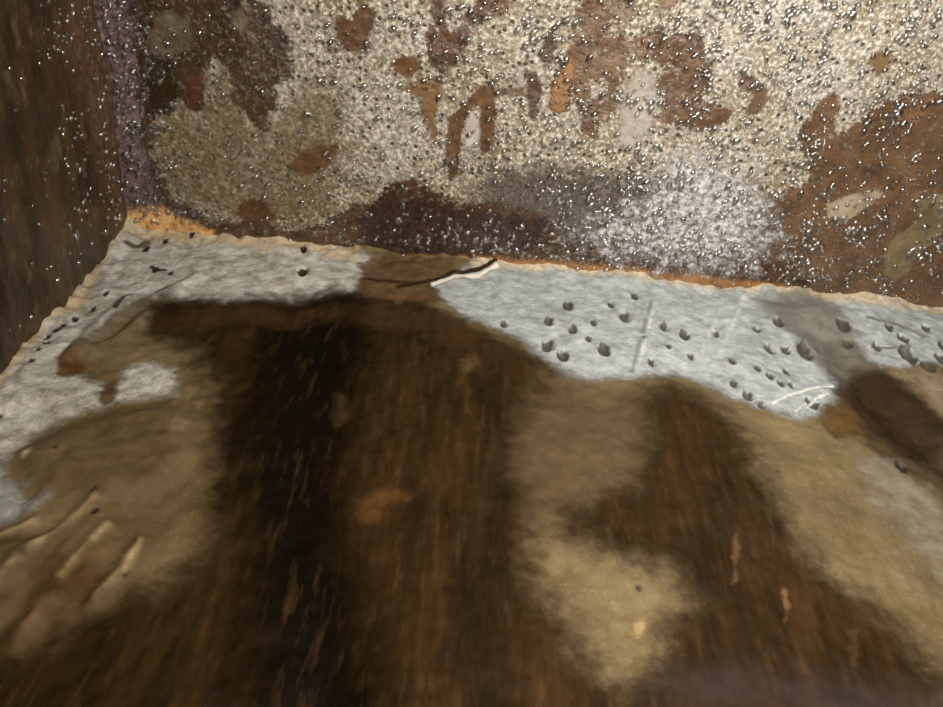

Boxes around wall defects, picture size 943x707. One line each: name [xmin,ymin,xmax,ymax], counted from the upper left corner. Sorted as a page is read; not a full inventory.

crack [364,258,499,288]
damp [0,231,943,707]
rust [68,0,943,308]
damp [470,153,943,585]